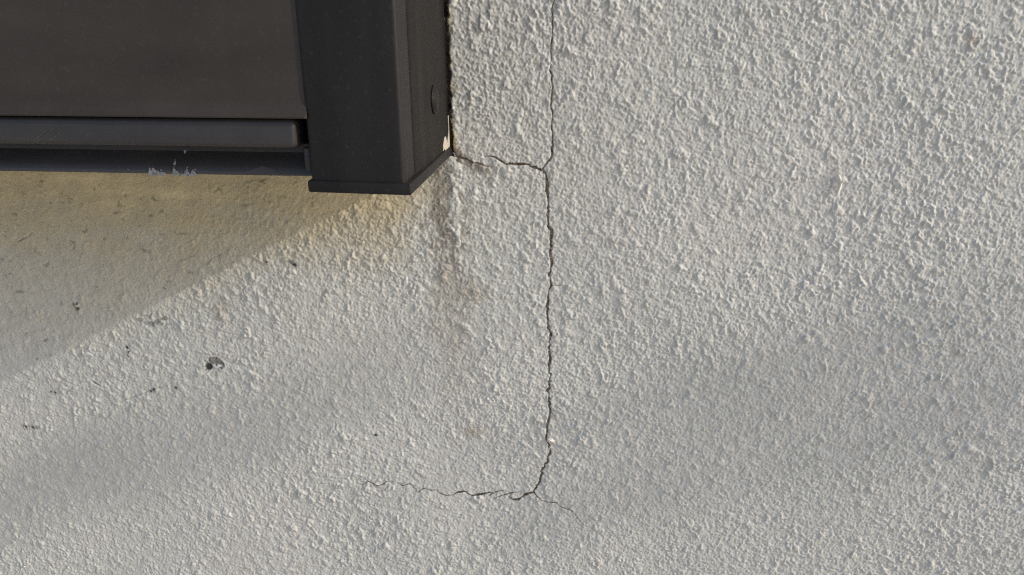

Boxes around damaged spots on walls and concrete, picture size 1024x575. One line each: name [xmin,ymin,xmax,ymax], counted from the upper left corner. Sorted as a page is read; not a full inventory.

crack [361,0,581,522]